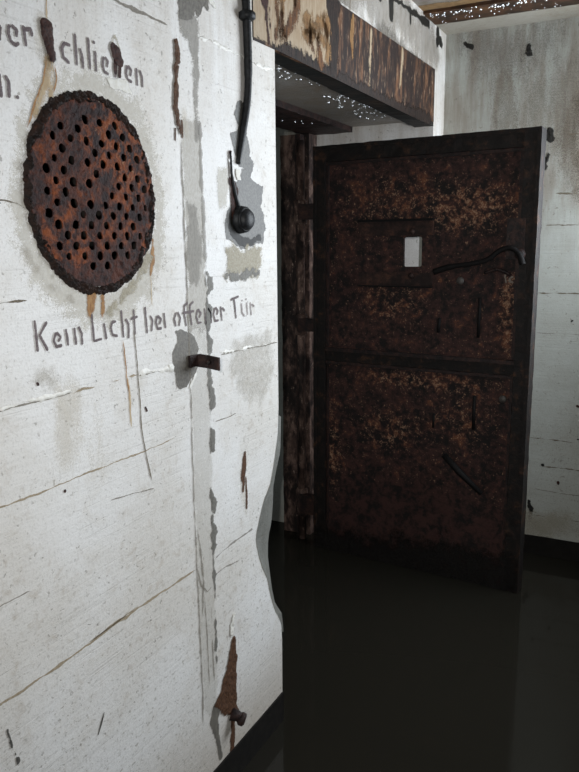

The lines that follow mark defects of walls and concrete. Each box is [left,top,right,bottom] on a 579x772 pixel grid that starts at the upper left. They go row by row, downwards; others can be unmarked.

corrosion [27,0,57,127]
corrosion [173,38,183,141]
damp [339,0,439,89]
corrosion [87,293,105,317]
crack [0,146,277,715]
corrosion [210,613,239,760]